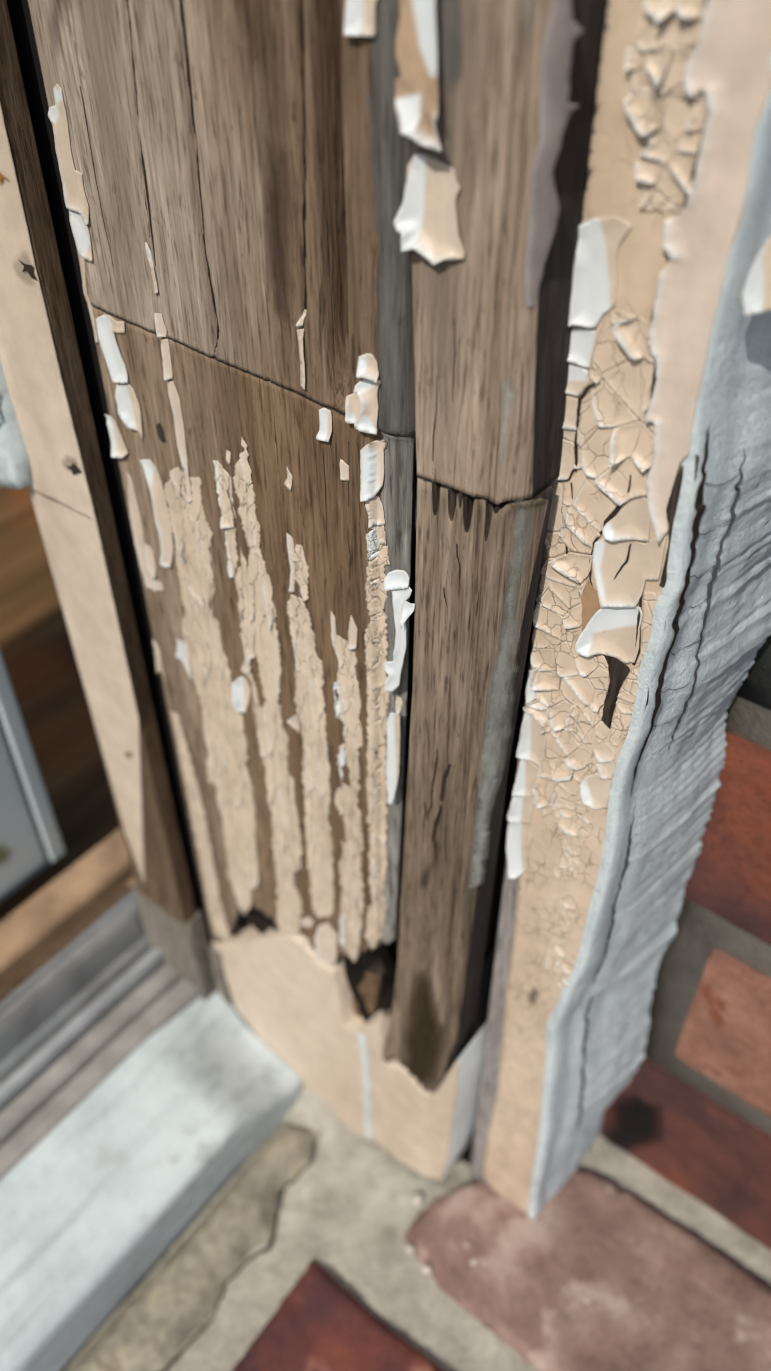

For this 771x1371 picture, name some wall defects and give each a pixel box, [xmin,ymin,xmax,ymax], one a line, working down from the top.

crack [80,87,114,268]
crack [126,0,159,292]
crack [179,0,219,353]
peeling [343,0,377,37]
peeling [393,0,465,265]
peeling [48,83,415,967]
peeling [506,0,771,991]
crack [162,1127,321,1371]